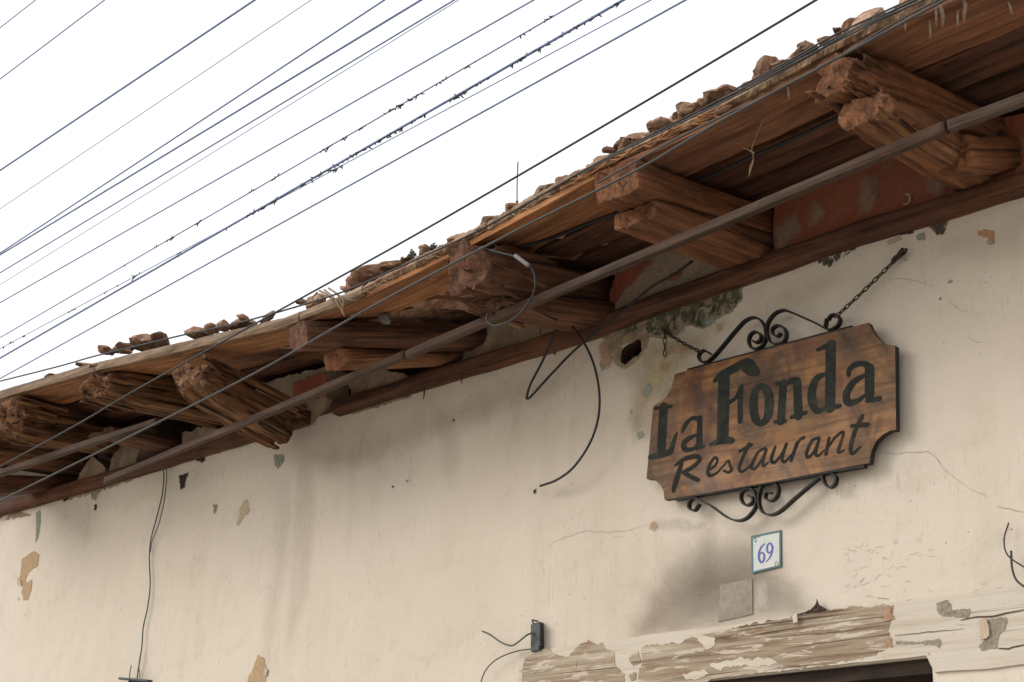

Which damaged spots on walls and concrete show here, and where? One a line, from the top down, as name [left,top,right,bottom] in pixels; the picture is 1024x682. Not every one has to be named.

peeling [978,230,995,244]
spalling [600,287,742,410]
peeling [236,500,249,525]
peeling [17,510,41,601]
peeling [248,655,268,682]
peeling [522,604,941,682]
peeling [936,600,1007,651]